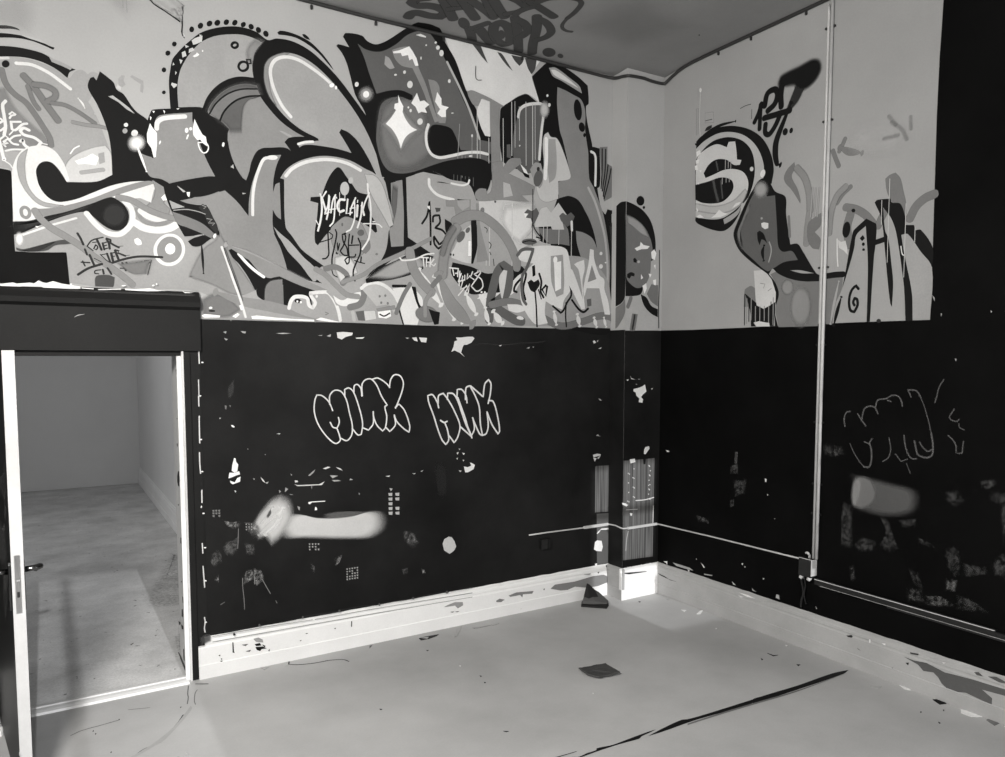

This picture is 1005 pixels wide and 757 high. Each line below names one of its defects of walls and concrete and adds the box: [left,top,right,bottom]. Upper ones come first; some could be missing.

peeling [451,337,474,356]
peeling [627,376,653,403]
peeling [229,458,241,493]
peeling [279,467,353,510]
peeling [905,652,1005,704]
crack [558,670,848,757]